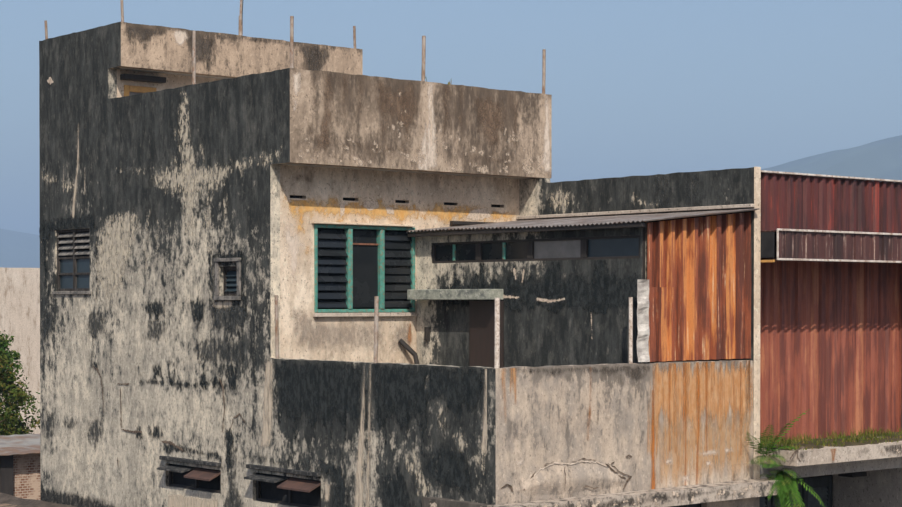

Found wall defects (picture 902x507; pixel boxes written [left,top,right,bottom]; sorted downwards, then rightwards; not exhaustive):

damp [126,27,160,43]
damp [190,35,220,67]
damp [302,46,332,149]
damp [380,84,417,133]
damp [419,85,436,170]
damp [543,101,551,171]
damp [163,428,244,507]
damp [255,361,487,507]
crack [501,455,632,492]
rust [647,360,753,489]